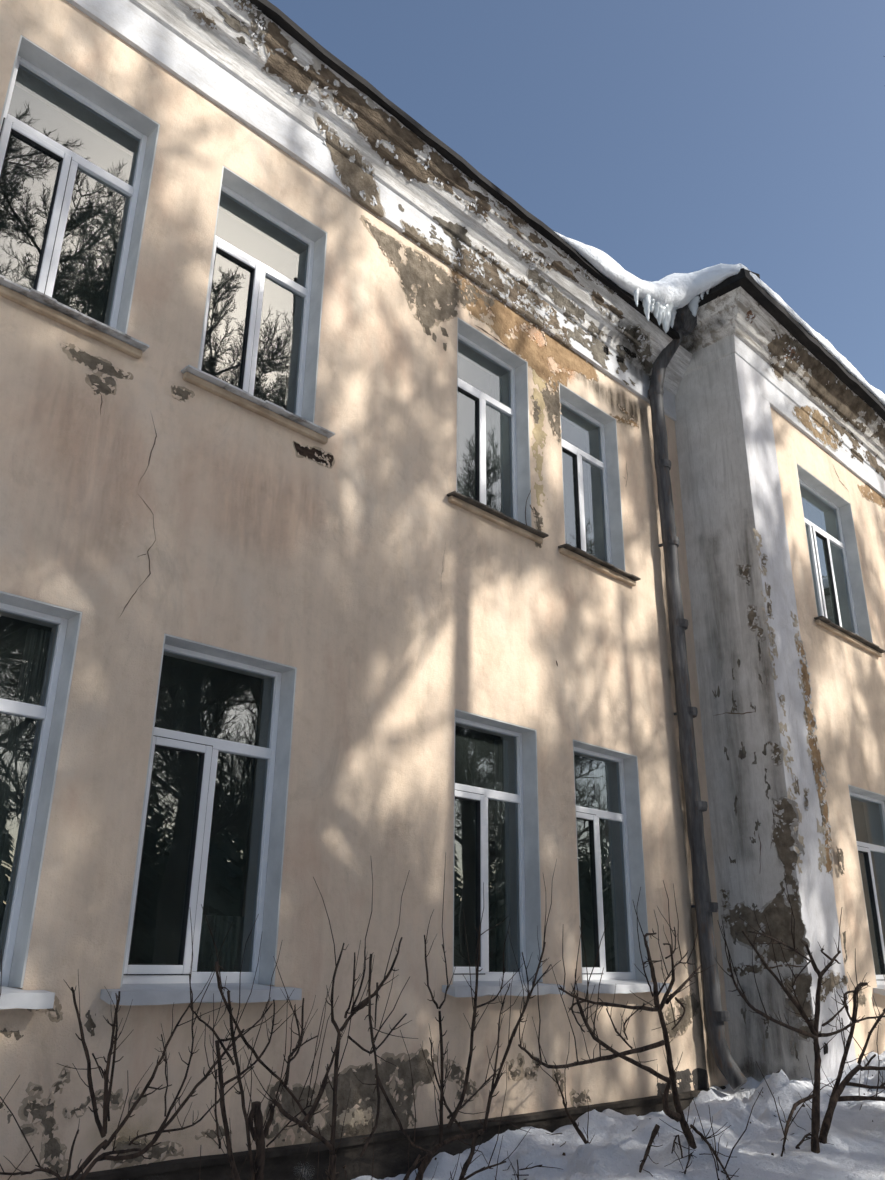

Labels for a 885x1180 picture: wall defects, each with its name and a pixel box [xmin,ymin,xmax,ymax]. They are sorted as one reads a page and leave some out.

spalling [185,0,654,548]
spalling [60,342,134,397]
spalling [767,320,885,480]
crack [120,414,157,616]
spalling [857,483,885,509]
spalling [719,528,867,1061]
spalling [22,995,63,1023]
spalling [665,987,699,1041]
spalling [0,1065,147,1177]
spalling [263,1048,479,1147]
spalling [507,1053,591,1108]
spalling [656,1068,710,1095]